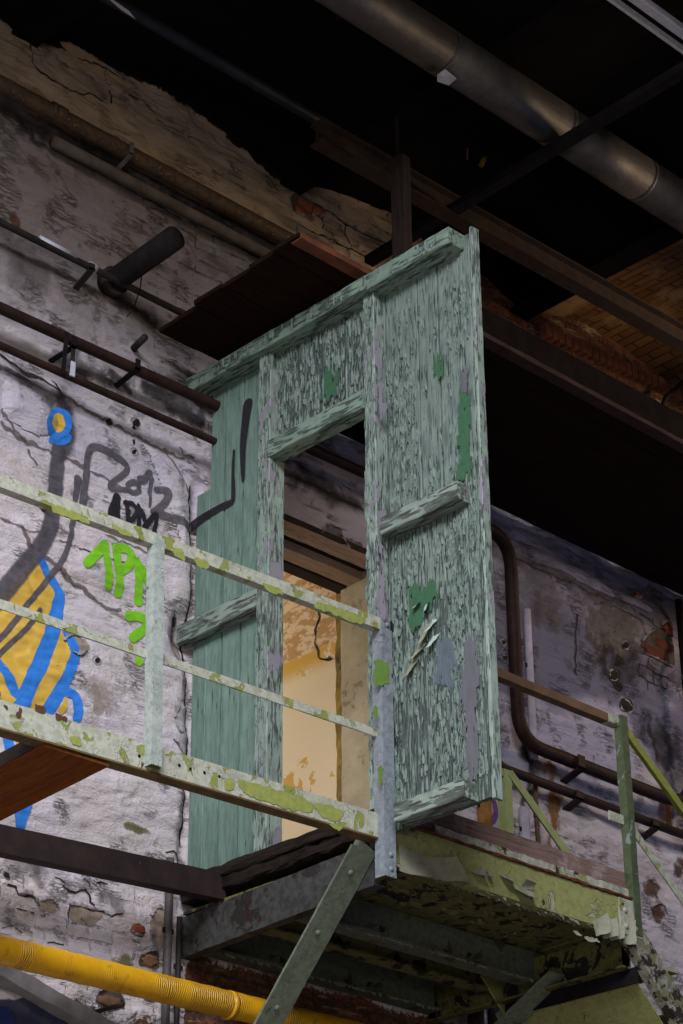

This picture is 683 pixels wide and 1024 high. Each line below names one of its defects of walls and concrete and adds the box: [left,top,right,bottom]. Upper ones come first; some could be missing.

peeling [60,41,137,89]
crack [30,44,243,163]
crack [303,204,386,257]
peeling [197,235,488,803]
peeling [173,547,209,569]
flaking render [608,619,675,715]
peeling [224,778,344,831]
spalling [19,889,105,927]
crack [2,877,123,945]
spalling [131,904,164,969]
peeling [386,845,637,945]
flaking render [95,989,125,1012]